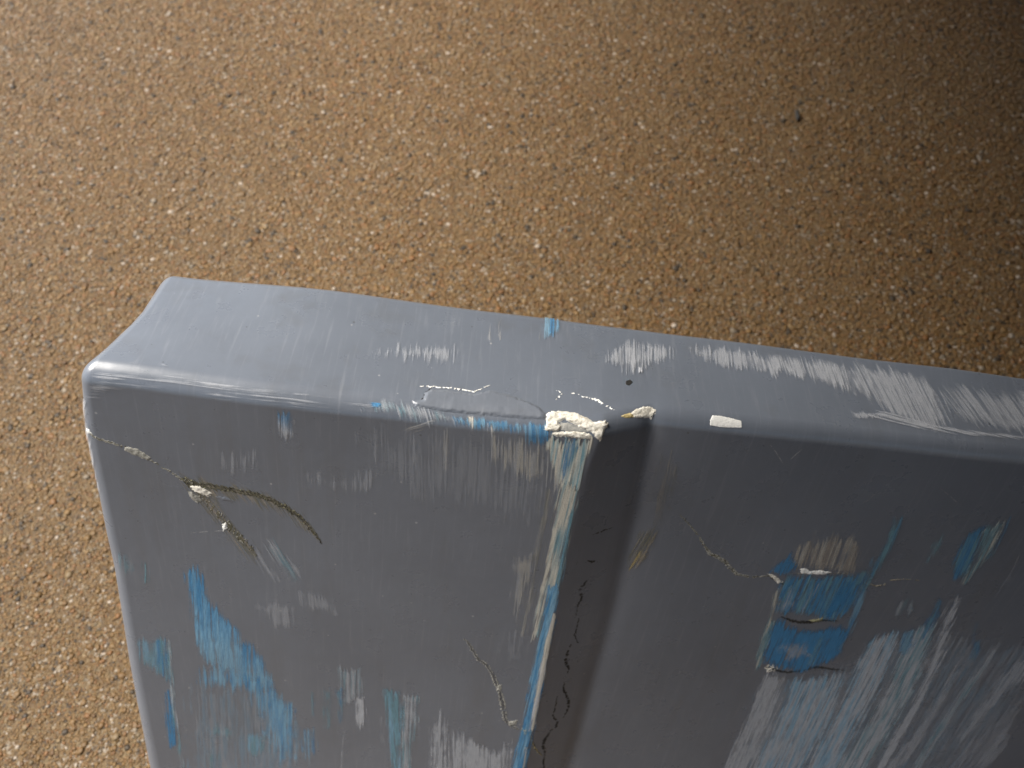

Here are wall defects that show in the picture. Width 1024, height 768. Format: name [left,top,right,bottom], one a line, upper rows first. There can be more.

peeling [543,411,609,442]
peeling [621,406,656,420]
peeling [710,415,742,428]
crack [86,428,322,556]
crack [679,514,919,624]
crack [464,560,598,768]
crack [765,649,842,674]